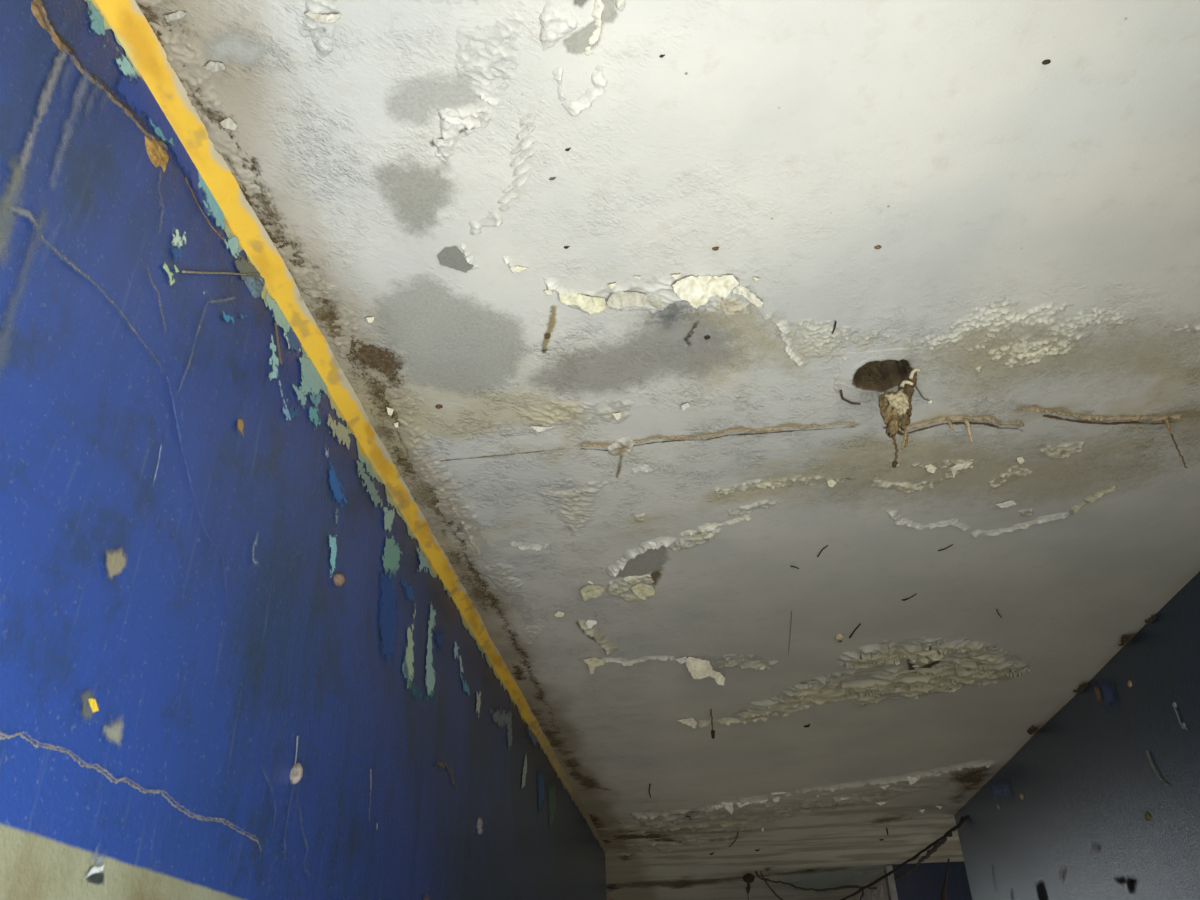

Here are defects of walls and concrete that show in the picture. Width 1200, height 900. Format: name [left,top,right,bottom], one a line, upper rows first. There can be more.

spalling [136,0,374,359]
peeling [542,273,808,366]
peeling [116,55,513,750]
peeling [107,549,126,577]
spalling [382,383,565,646]
rust [606,436,636,477]
peeling [580,515,752,602]
water stain [986,457,1034,492]
peeling [81,691,99,718]
peeling [583,654,779,686]
peeling [677,637,1033,729]
crack [0,732,261,851]